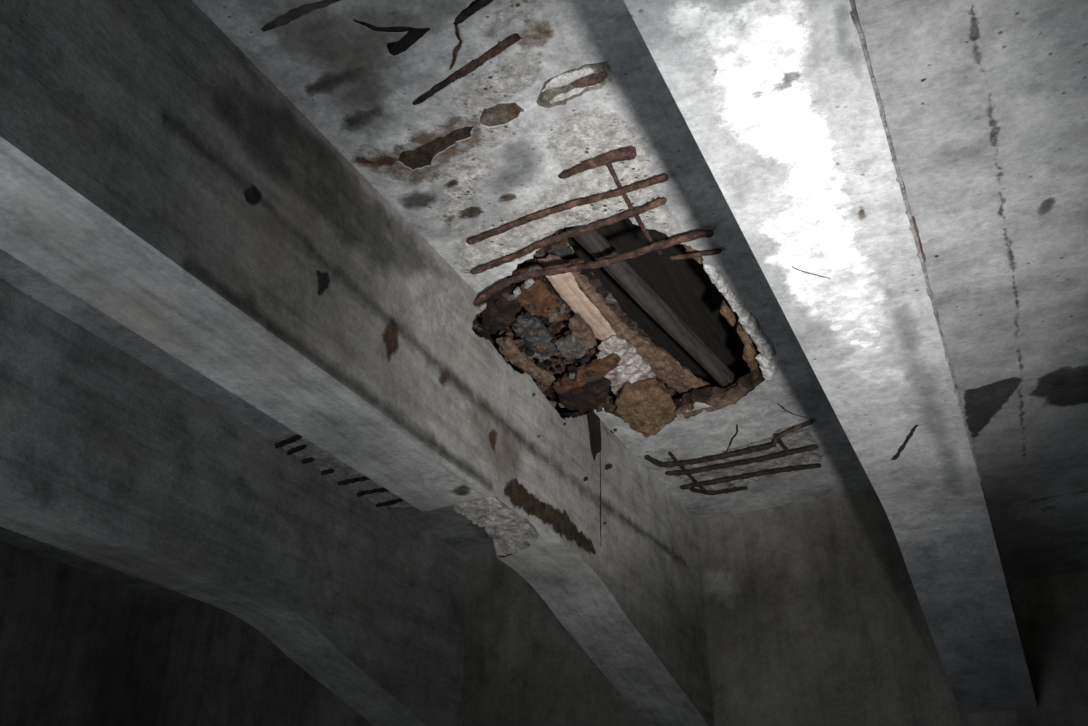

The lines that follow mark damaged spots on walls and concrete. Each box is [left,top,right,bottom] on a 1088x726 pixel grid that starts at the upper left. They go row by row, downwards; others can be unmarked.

peeling [355,0,778,426]
peeling [663,0,907,423]
spalling [559,396,624,433]
crack [891,425,919,460]
damp [964,377,1021,437]
damp [1032,366,1088,406]
spalling [417,462,540,556]
rust [504,478,596,555]